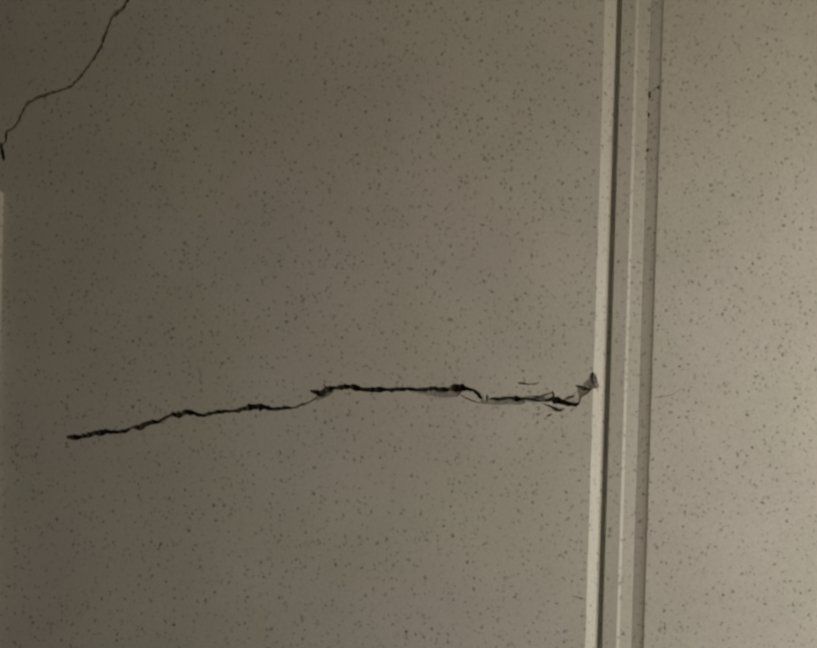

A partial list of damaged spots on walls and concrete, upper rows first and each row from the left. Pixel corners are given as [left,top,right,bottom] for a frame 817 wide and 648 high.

crack [0,0,129,161]
crack [66,379,581,440]